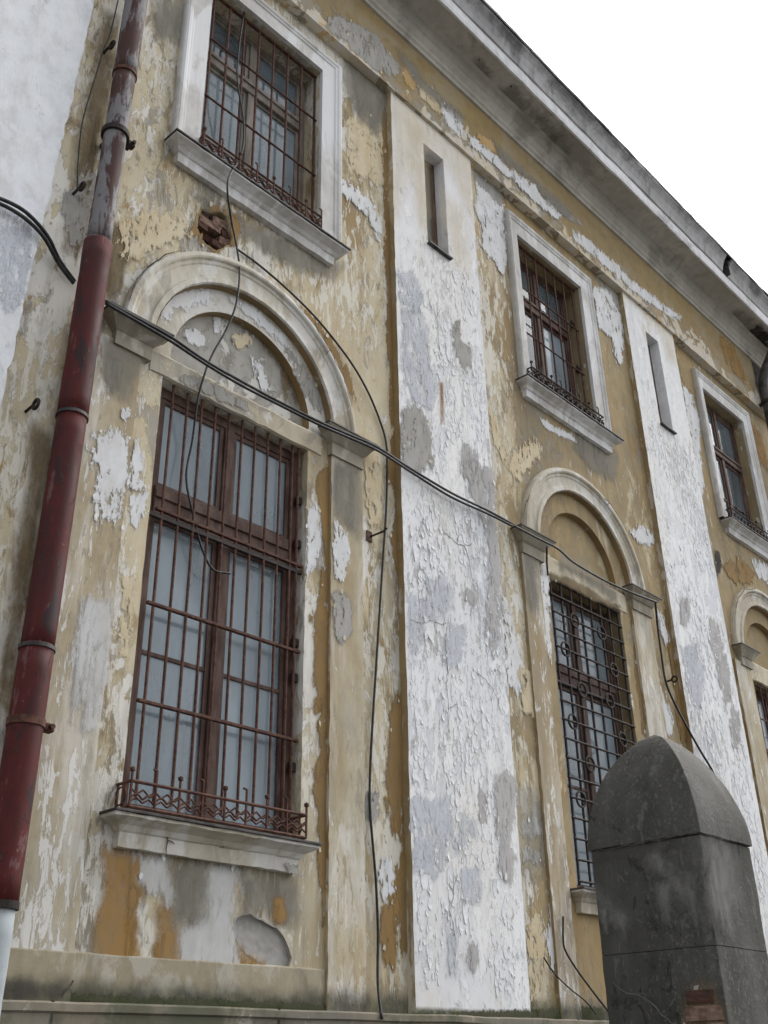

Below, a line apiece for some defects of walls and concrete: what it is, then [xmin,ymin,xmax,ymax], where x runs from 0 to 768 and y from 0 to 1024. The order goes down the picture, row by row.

peeling [115,201,242,262]
peeling [324,12,682,365]
peeling [184,317,221,348]
peeling [228,295,323,414]
peeling [85,407,151,531]
peeling [646,342,707,506]
peeling [342,110,555,1003]
peeling [304,466,357,928]
peeling [630,519,768,905]
peeling [132,850,177,909]
peeling [176,863,293,967]